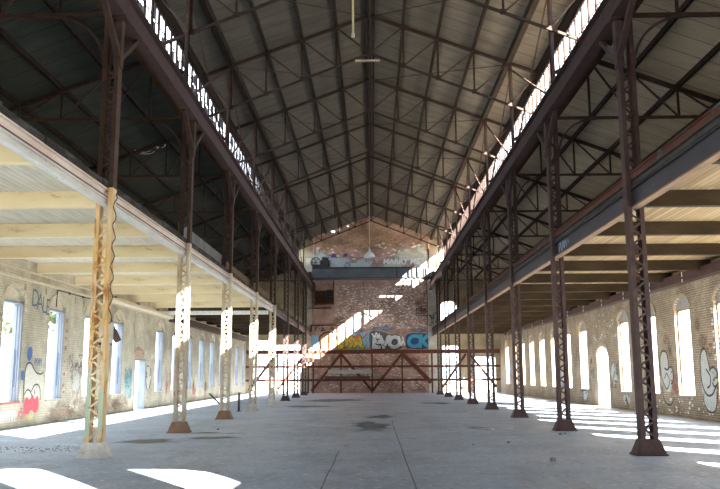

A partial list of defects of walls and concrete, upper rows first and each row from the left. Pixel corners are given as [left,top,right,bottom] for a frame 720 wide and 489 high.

corrosion [432,106,720,329]
peeling [107,394,127,411]
crack [392,421,417,489]